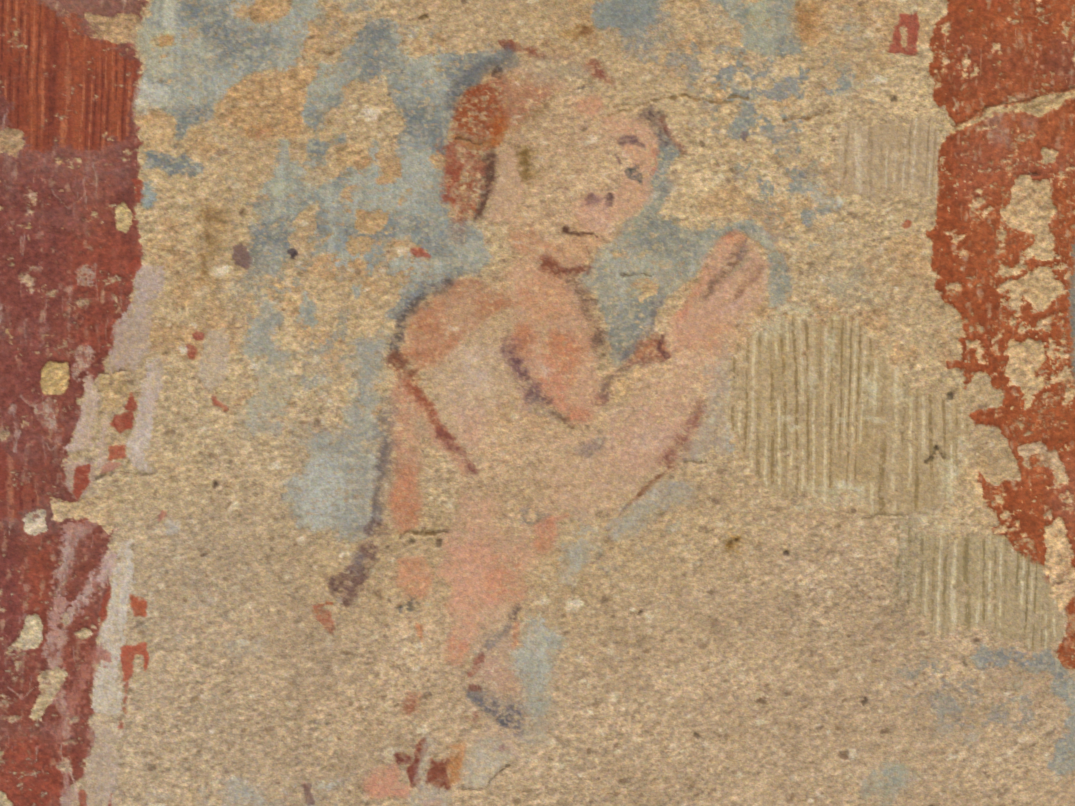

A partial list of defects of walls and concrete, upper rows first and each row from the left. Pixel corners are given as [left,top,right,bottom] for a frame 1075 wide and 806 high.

peeling [1036,0,1075,62]
crack [914,87,1075,135]
peeling [0,120,29,158]
peeling [14,188,64,235]
peeling [945,230,968,259]
peeling [8,258,92,324]
peeling [99,271,139,314]
flaking render [6,329,79,396]
flaking render [0,602,44,682]
flaking render [75,603,112,646]
peeling [0,667,68,729]
flaking render [0,792,13,806]